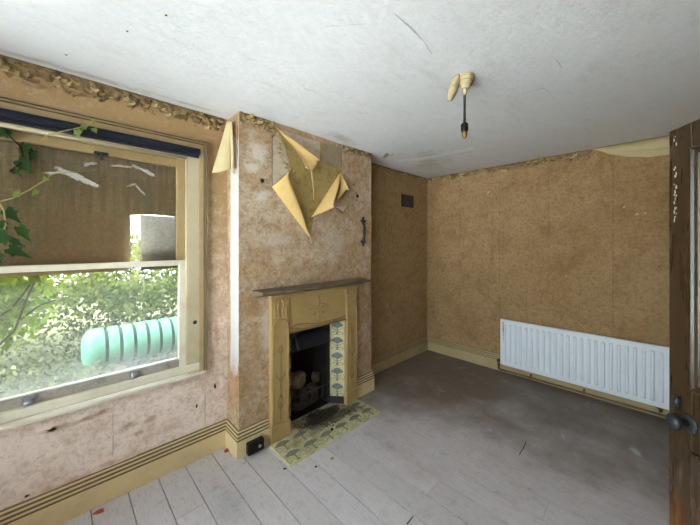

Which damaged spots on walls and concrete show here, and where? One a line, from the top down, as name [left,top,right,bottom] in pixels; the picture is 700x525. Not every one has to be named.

crack [395,14,432,54]
peeling [0,54,225,132]
flaking render [240,111,341,240]